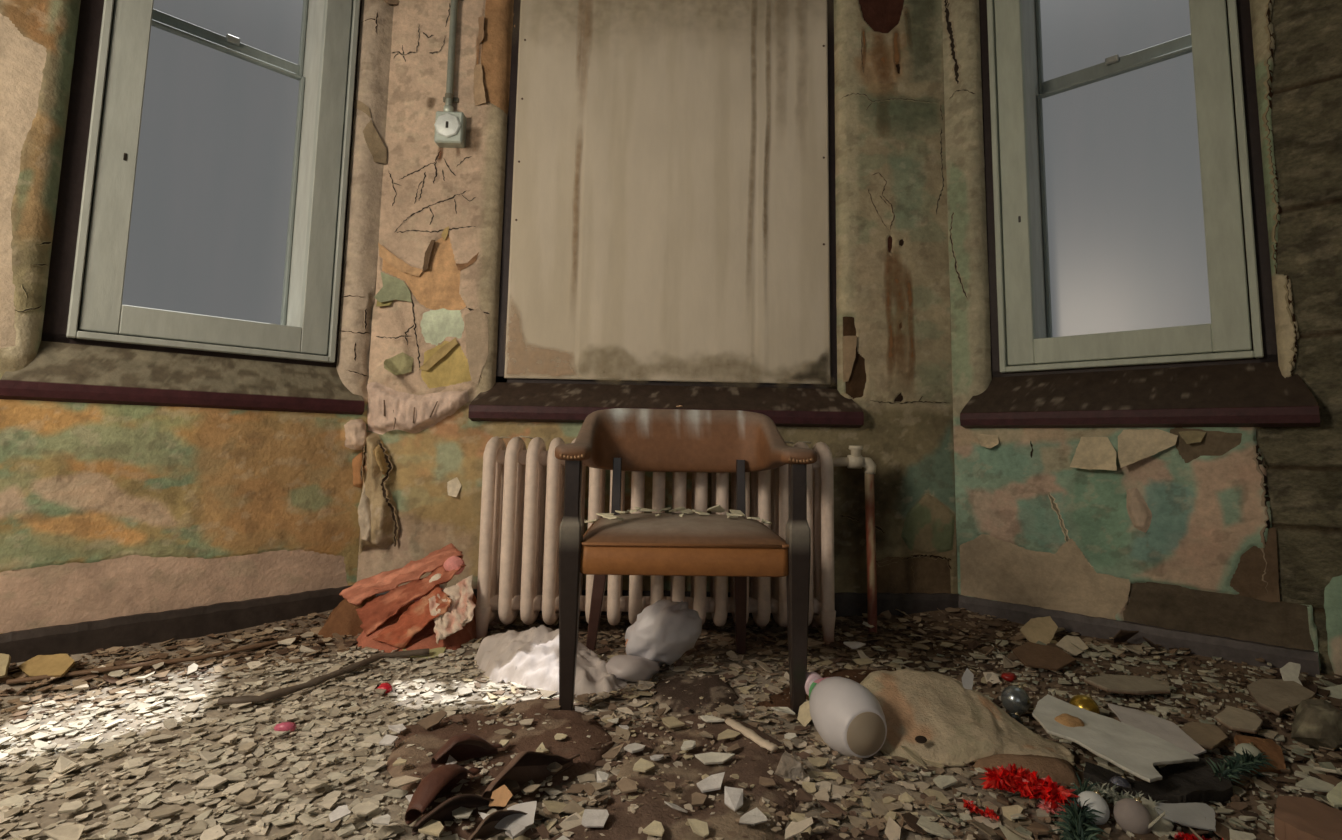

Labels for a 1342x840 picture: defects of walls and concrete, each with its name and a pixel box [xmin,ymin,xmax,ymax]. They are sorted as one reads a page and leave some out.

crack [360,0,451,62]
flaking render [473,0,515,117]
flaking render [859,0,904,33]
peeling [0,14,47,349]
peeling [354,100,387,164]
crack [388,153,478,234]
crack [839,0,975,299]
flaking render [374,226,489,389]
water stain [795,355,827,383]
spalling [876,0,1342,676]
crack [360,440,399,547]
peeling [0,549,348,633]